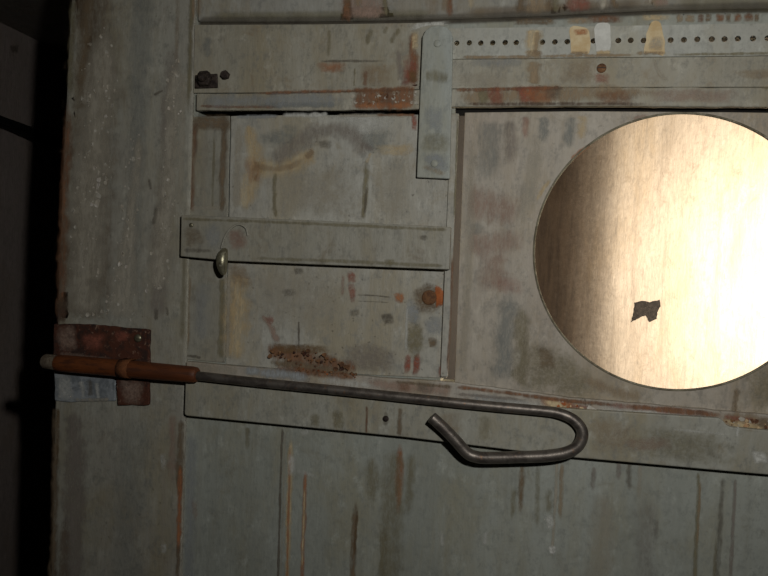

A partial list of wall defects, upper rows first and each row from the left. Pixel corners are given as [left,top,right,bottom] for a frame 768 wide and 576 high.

corrosion [265,22,443,95]
corrosion [396,262,453,374]
corrosion [459,386,610,405]
corrosion [633,406,716,416]